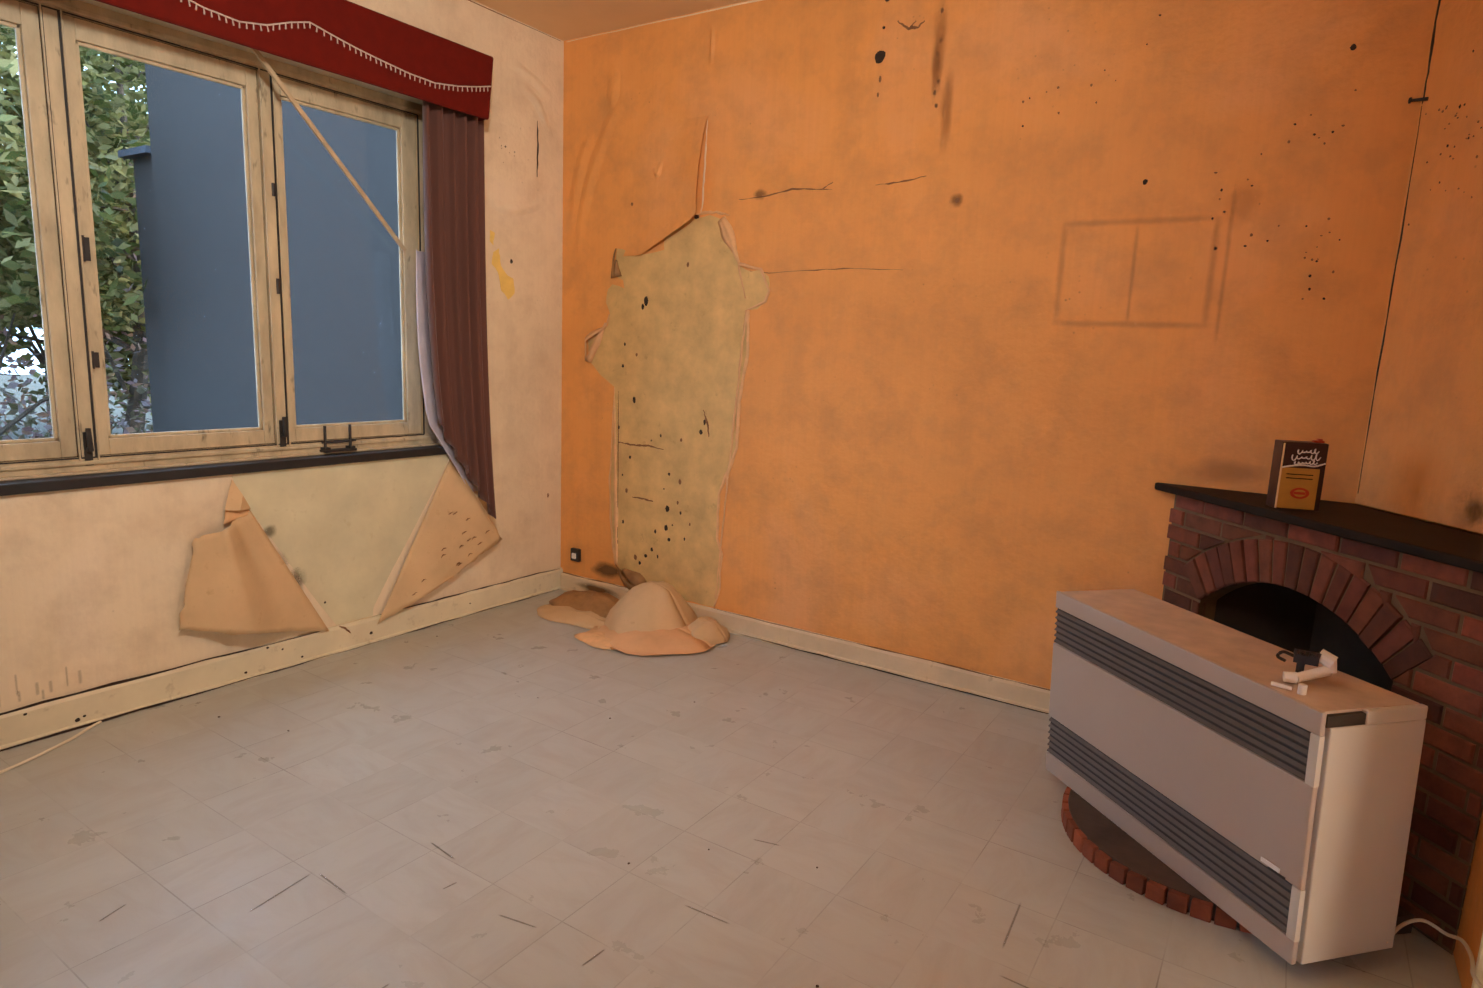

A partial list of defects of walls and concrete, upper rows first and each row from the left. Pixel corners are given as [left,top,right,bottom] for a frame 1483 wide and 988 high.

crack [739,182,833,200]
crack [878,176,925,185]
flaking render [588,215,770,607]
flaking render [232,454,450,634]